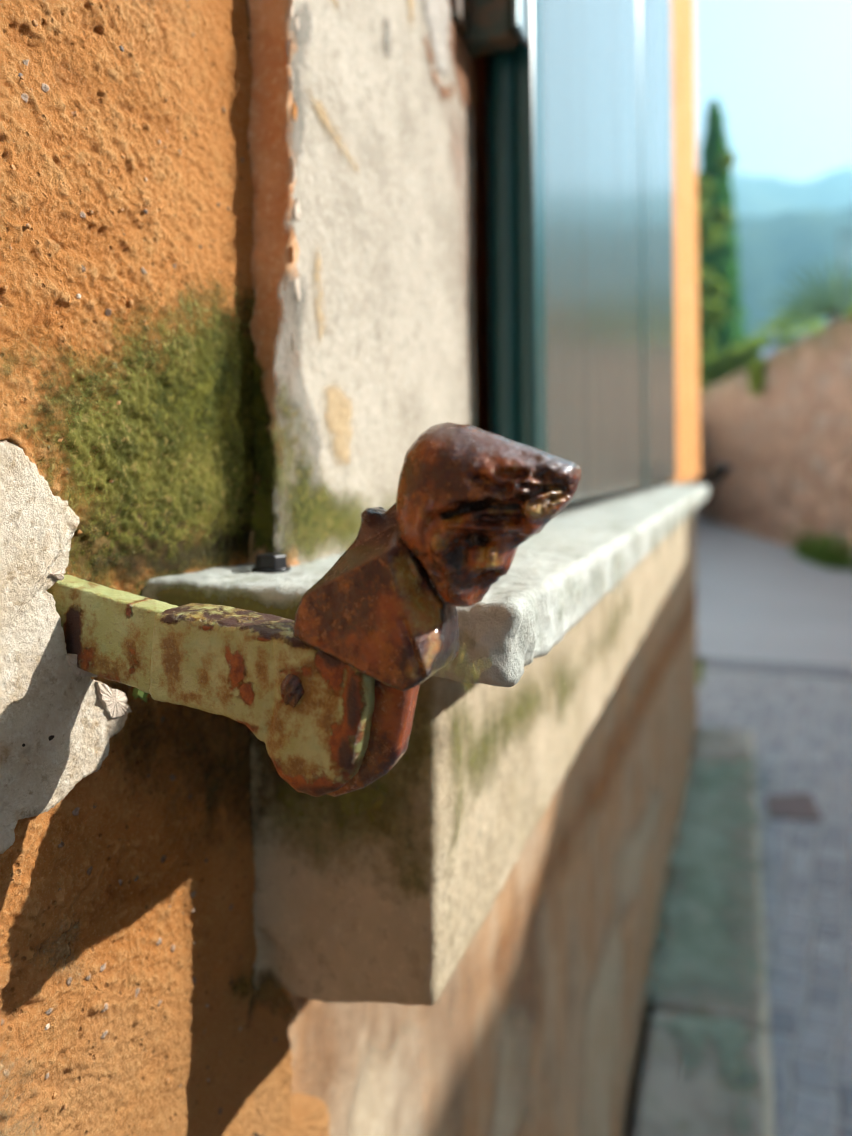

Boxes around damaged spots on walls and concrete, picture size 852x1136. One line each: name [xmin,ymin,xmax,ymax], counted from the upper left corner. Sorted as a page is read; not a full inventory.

flaking render [0,440,132,854]